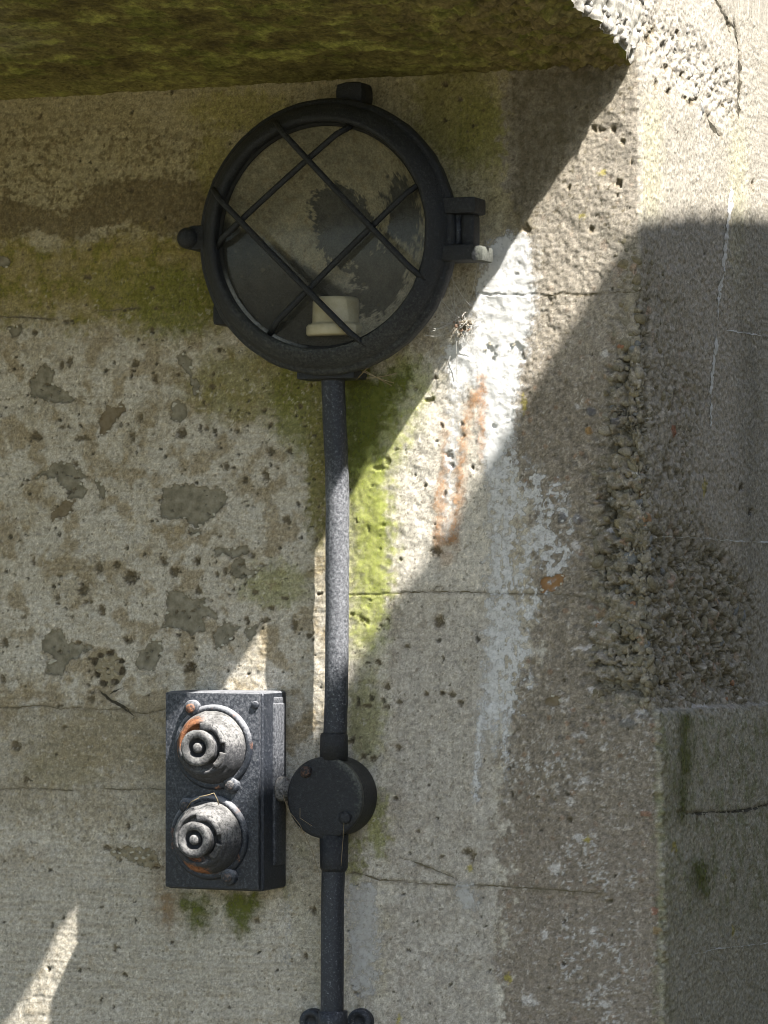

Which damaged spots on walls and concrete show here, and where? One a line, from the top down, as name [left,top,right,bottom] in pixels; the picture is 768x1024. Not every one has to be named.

peeling [30,363,75,403]
peeling [99,401,126,436]
rust [434,376,486,544]
peeling [35,461,108,522]
peeling [160,483,228,537]
leakage [440,230,579,801]
peeling [162,591,257,651]
peeling [42,629,125,686]
crack [687,803,768,820]
crack [352,858,597,894]